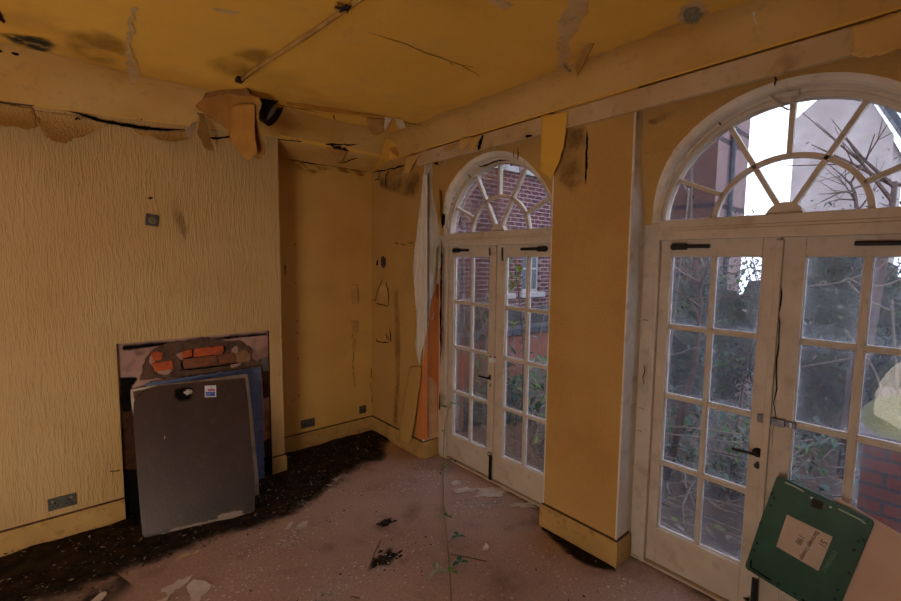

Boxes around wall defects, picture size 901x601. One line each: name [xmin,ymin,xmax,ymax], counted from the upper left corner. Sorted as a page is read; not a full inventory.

water stain [3,34,53,51]
crack [369,32,479,76]
peeling [556,0,595,77]
crack [69,111,184,131]